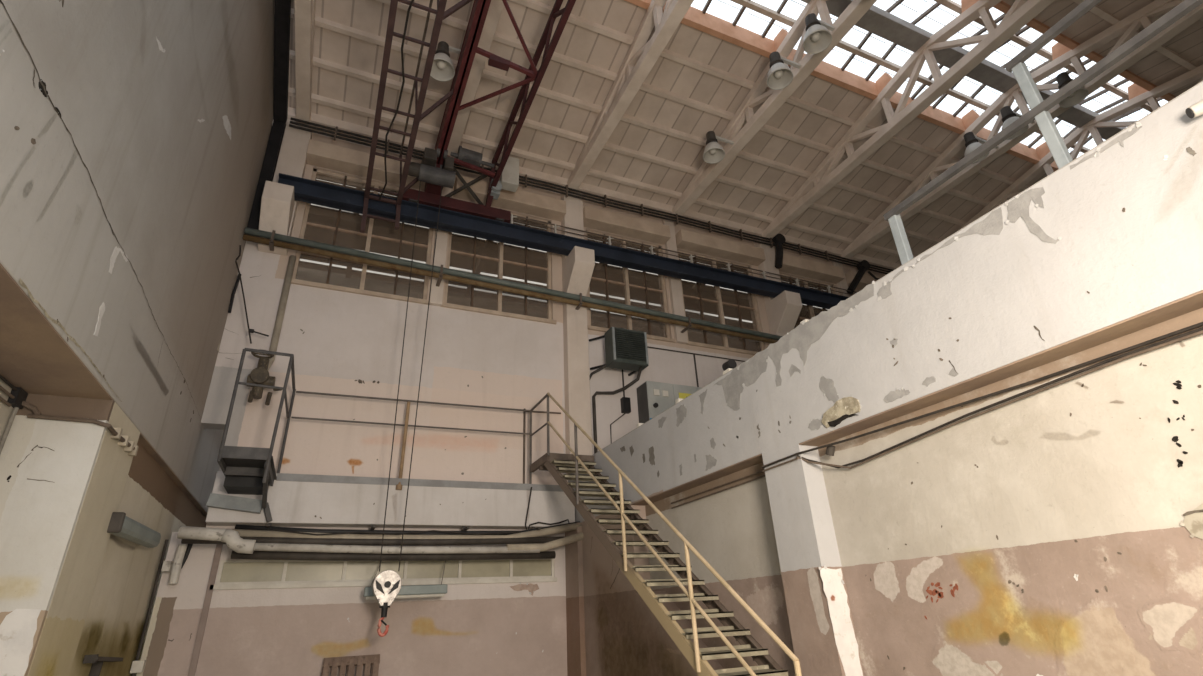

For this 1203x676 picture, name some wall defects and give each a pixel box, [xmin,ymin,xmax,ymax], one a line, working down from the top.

crack [0,0,201,419]
peeling [658,187,1061,476]
flaking render [1168,380,1194,468]
peeling [865,548,948,635]
rust [926,582,958,603]
peeling [1036,586,1202,676]